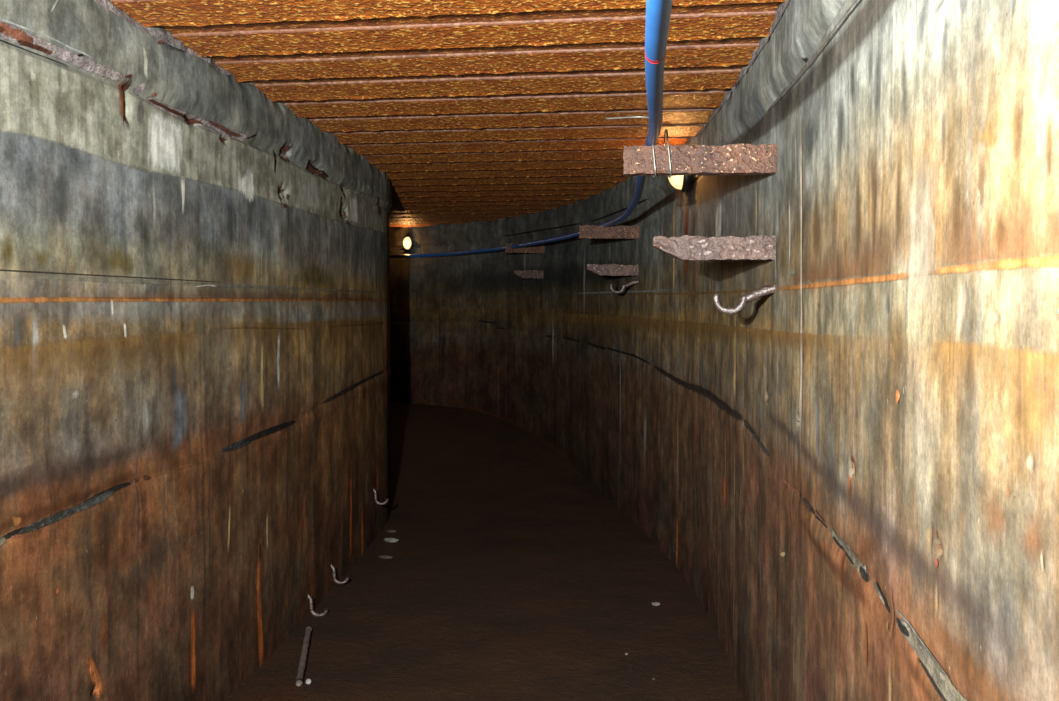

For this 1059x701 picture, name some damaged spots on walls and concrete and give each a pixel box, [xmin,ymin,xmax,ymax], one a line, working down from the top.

leakage [869,56,879,105]
leakage [766,126,1059,444]
crack [324,371,383,403]
crack [546,335,769,456]
crack [179,421,296,470]
crack [0,475,151,546]
crack [784,479,967,701]